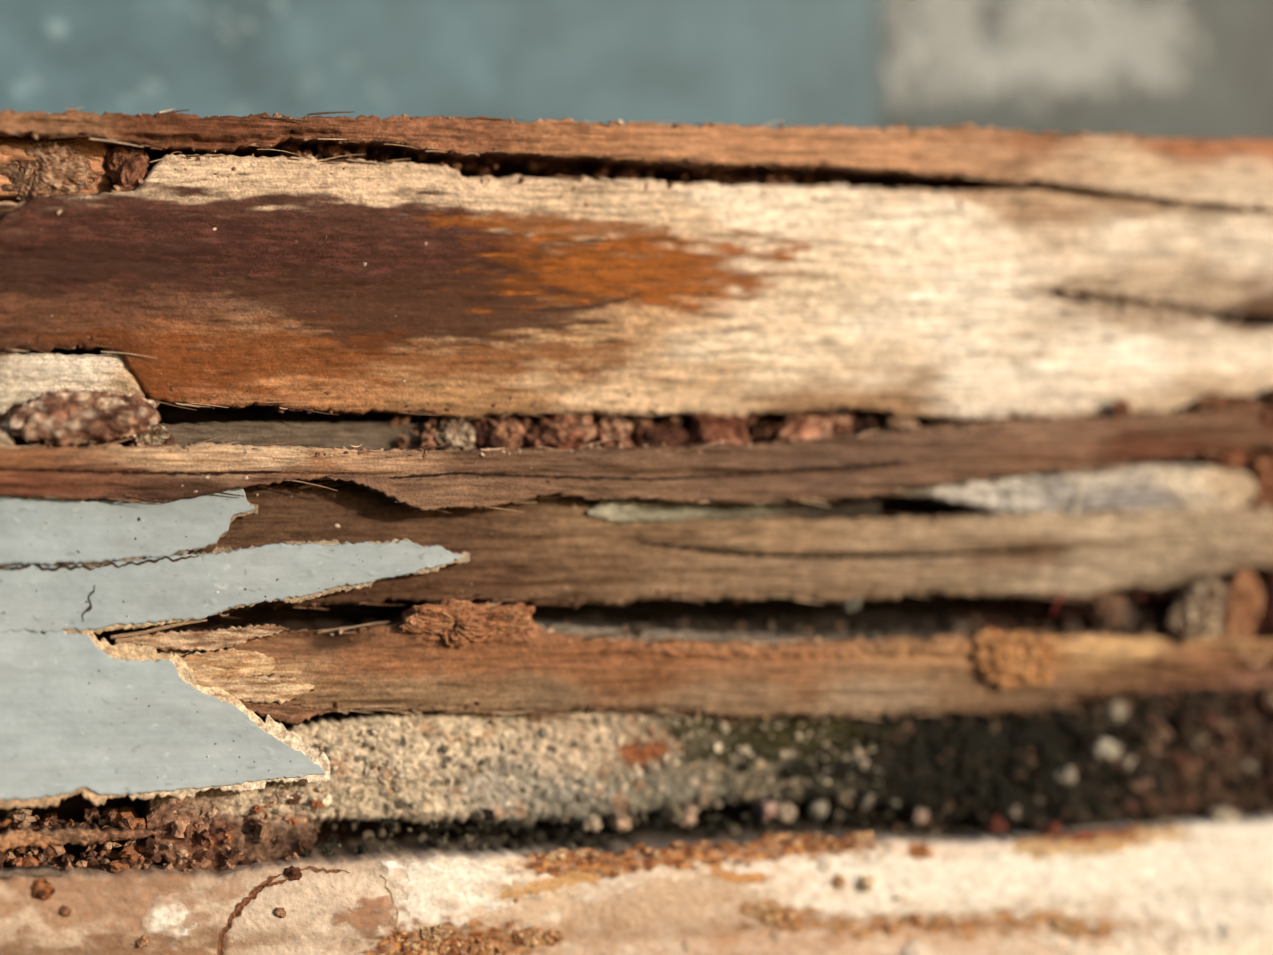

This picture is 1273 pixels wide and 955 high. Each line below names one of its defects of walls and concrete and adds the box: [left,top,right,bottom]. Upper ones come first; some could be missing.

crack [1224,316,1273,328]
peeling [0,487,470,811]
leakage [670,699,1146,831]
corrosion [502,831,878,898]
corrosion [909,840,934,859]
crack [215,866,350,955]
crack [380,875,398,930]
corrosion [334,896,565,955]
corrosion [725,899,1132,941]